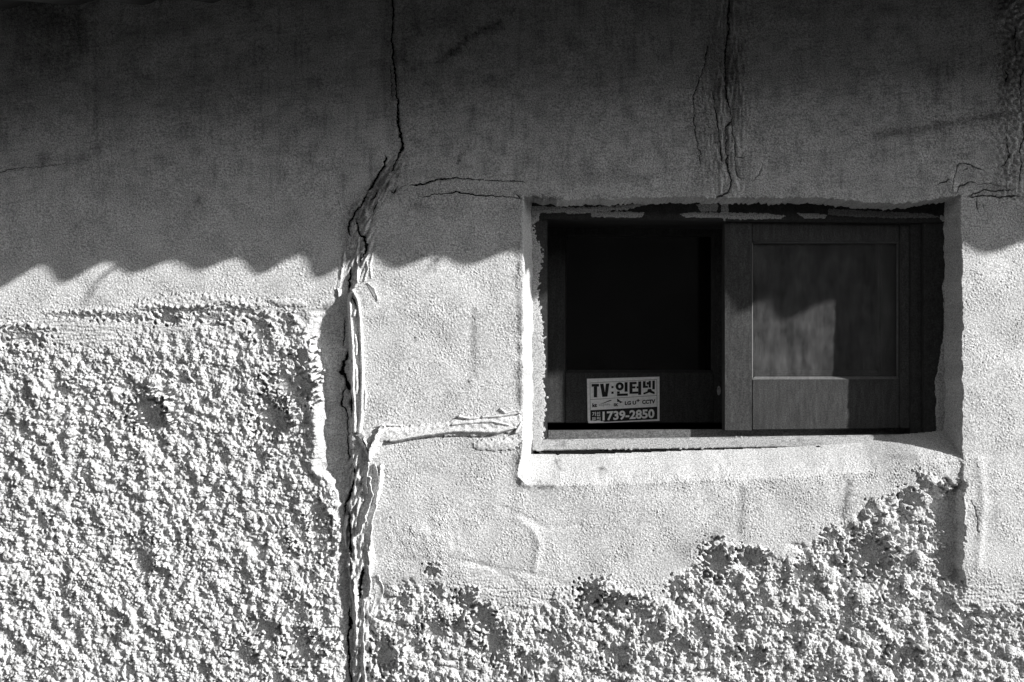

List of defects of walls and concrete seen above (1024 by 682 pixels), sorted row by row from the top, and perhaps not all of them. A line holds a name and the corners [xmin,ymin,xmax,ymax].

crack [693,0,762,198]
crack [937,28,1024,210]
spalling [65,291,308,318]
crack [339,0,523,682]
spalling [696,538,765,555]
spalling [912,467,968,561]
spalling [552,577,654,612]